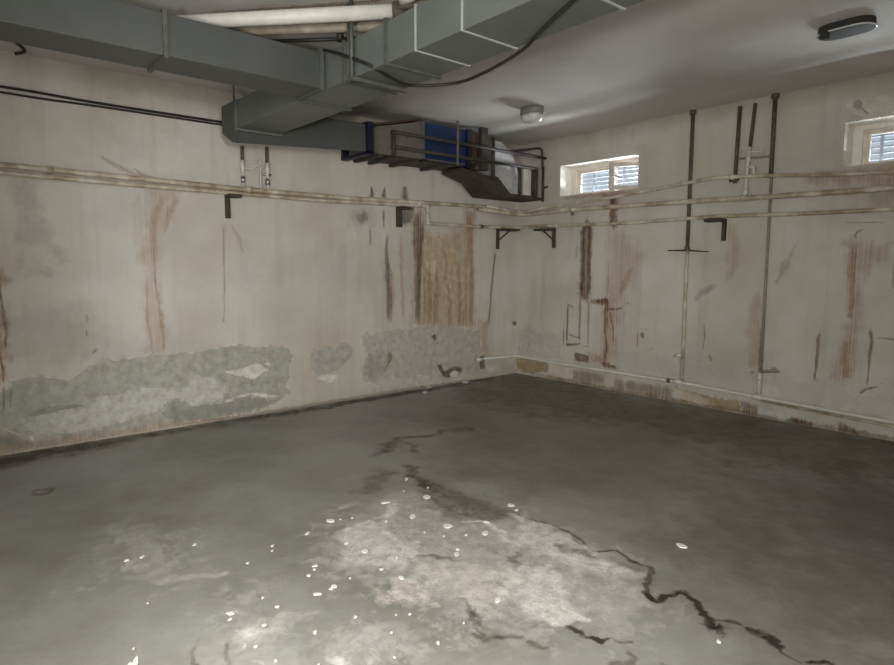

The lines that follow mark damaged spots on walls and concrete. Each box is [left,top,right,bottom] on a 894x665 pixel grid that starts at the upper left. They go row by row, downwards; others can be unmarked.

rust [0,274,11,409]
peeling [0,344,293,450]
peeling [308,343,353,383]
peeling [362,326,501,392]
rust [402,207,476,328]
rust [576,220,628,368]
crack [460,598,548,650]
crack [517,513,834,665]